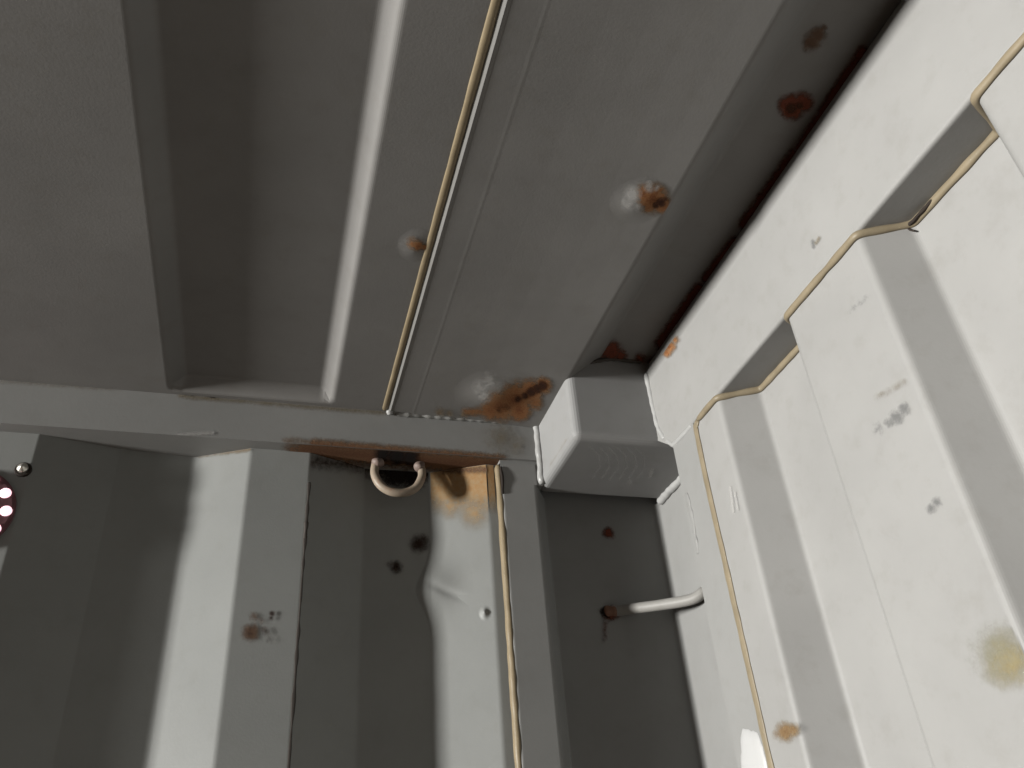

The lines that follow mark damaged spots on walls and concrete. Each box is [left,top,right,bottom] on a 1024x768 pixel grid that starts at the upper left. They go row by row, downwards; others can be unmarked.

corrosion [602,46,867,363]
corrosion [437,376,552,423]
corrosion [284,438,505,523]
corrosion [412,536,428,550]
corrosion [776,723,798,740]